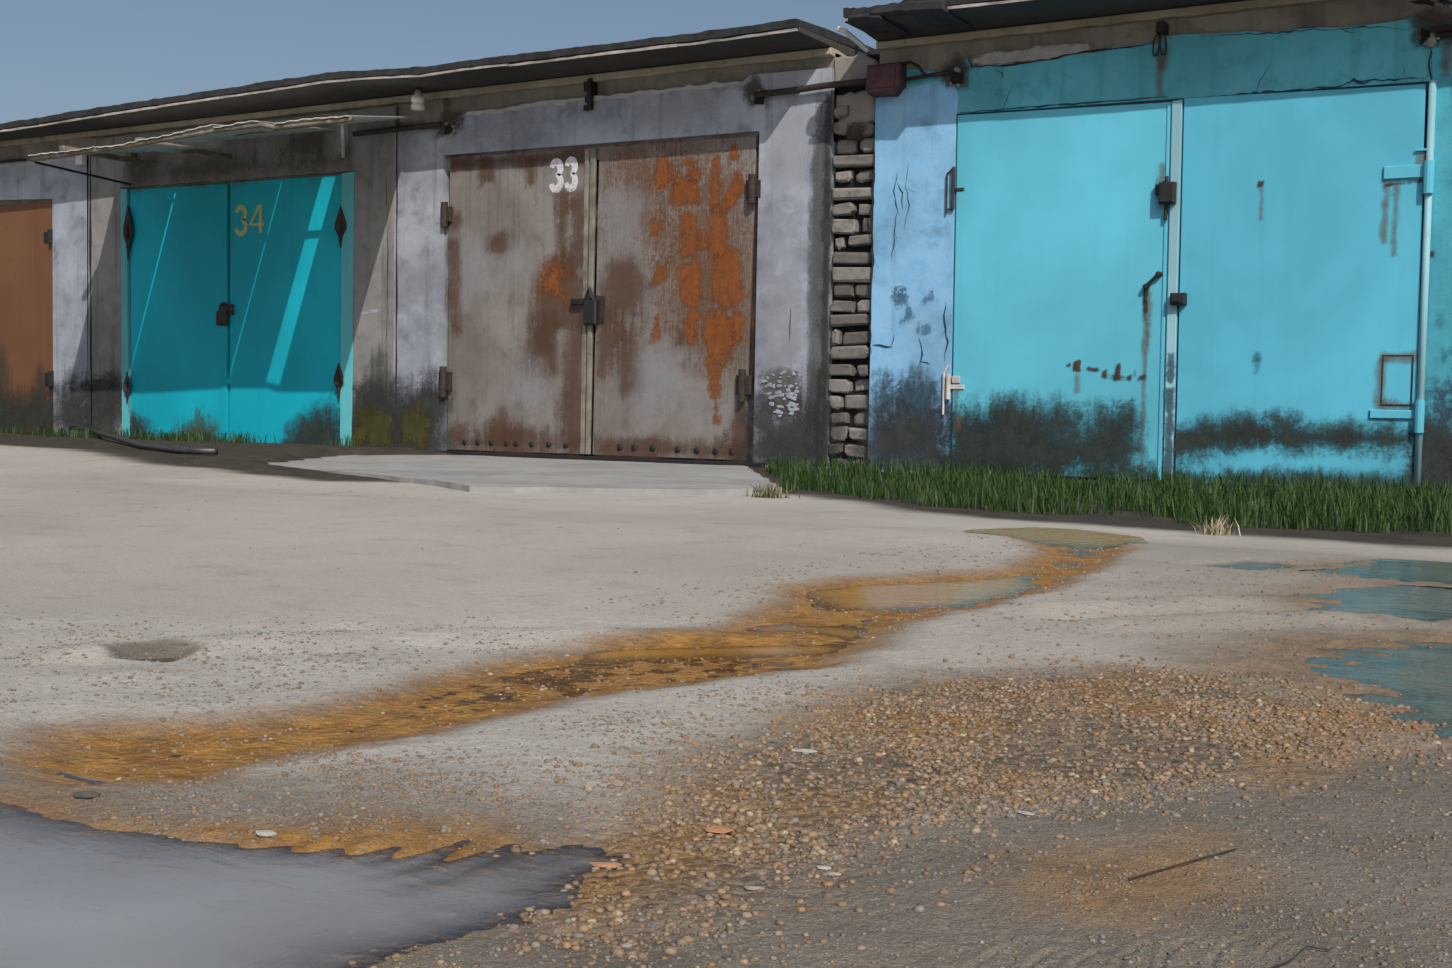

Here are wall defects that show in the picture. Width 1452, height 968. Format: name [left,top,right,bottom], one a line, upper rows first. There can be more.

rust [448,212,461,332]
rust [450,144,749,460]
leakage [738,94,840,467]
leakage [281,373,453,451]
leakage [859,385,1452,491]